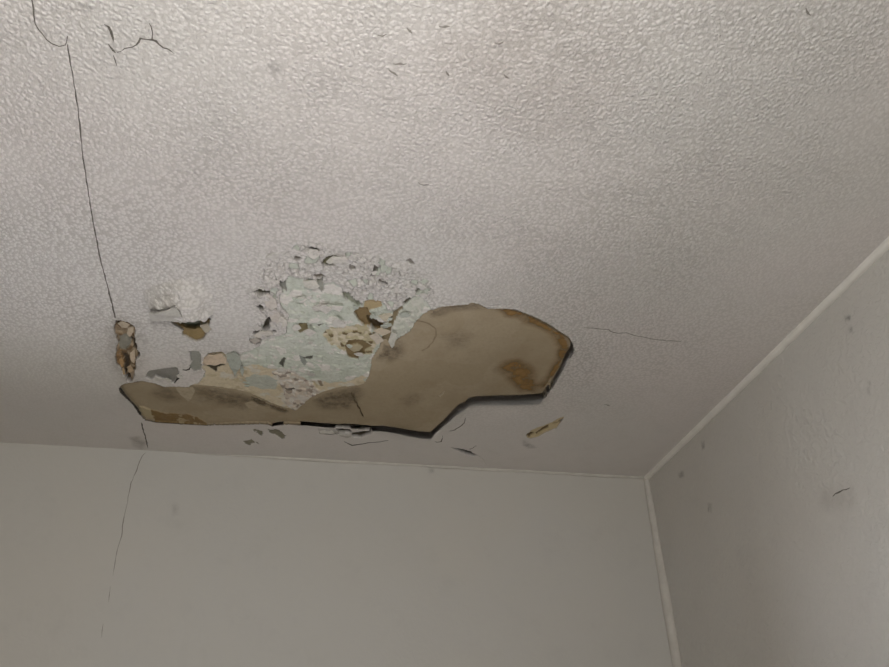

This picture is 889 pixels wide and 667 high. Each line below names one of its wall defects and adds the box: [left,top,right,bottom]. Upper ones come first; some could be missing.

crack [104,23,173,66]
crack [31,0,117,323]
flaking render [112,241,573,446]
crack [108,388,148,602]